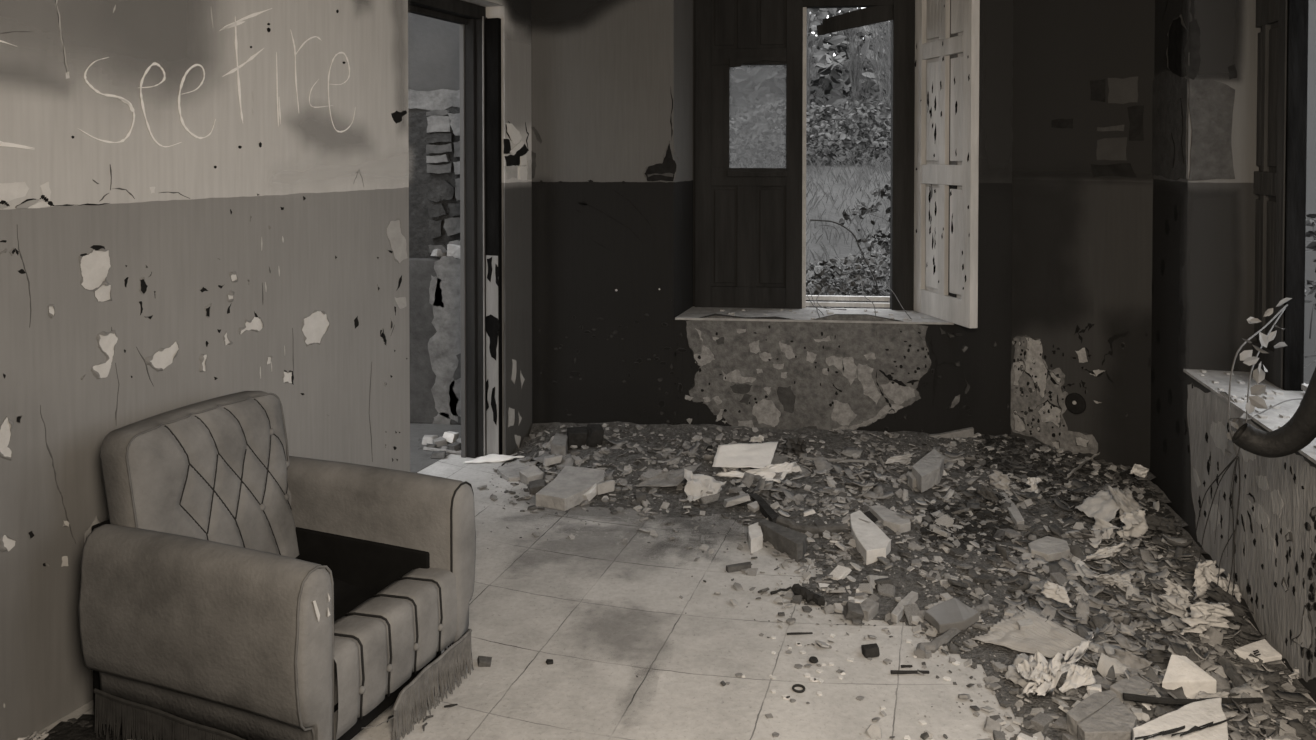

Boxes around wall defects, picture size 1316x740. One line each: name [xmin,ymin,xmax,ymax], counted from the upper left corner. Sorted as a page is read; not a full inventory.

peeling [0,415,22,461]
crack [0,165,190,328]
peeling [81,330,126,380]
peeling [78,245,156,320]
peeling [145,341,179,372]
peeling [199,271,264,380]
peeling [302,310,330,347]
peeling [377,219,408,359]
peeling [428,256,461,425]
peeling [680,313,970,431]
peeling [993,335,1105,456]
peeling [0,531,35,552]